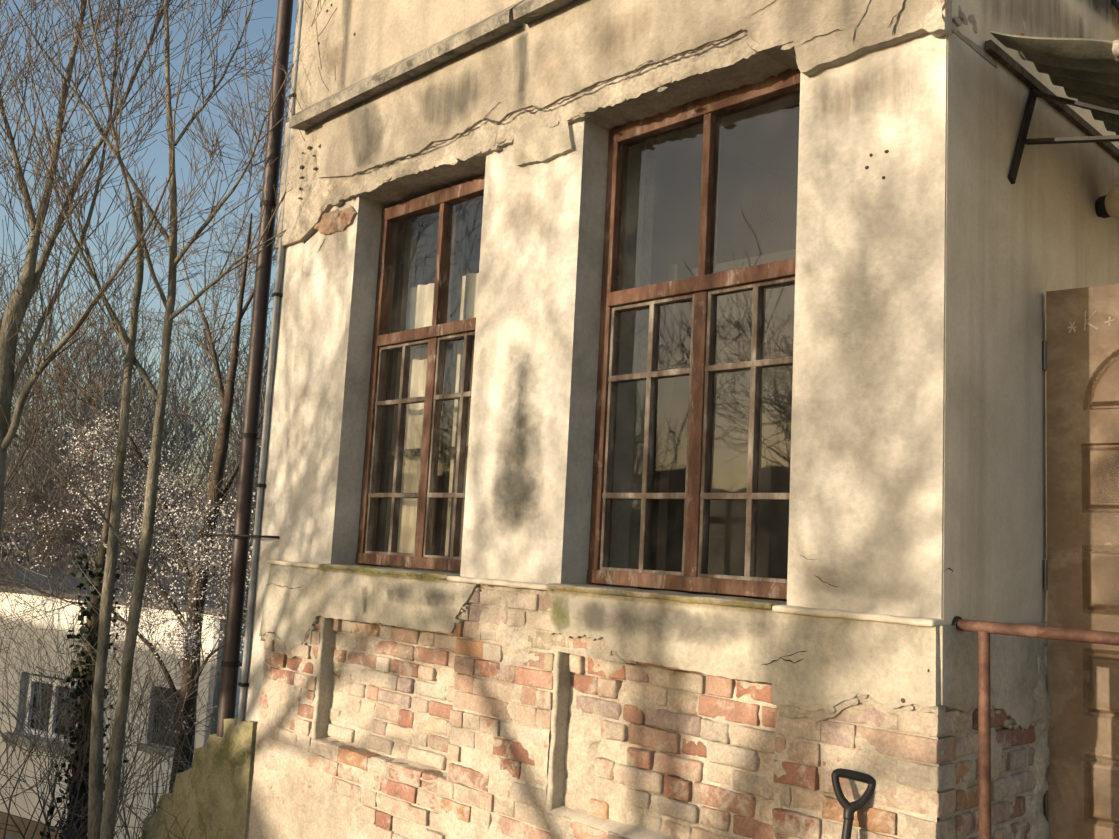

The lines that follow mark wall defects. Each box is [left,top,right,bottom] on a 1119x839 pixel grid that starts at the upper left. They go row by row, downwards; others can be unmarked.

flaking render [298,32,796,235]
crack [354,0,776,174]
crack [802,0,906,44]
damp [504,376,528,516]
flaking render [259,617,320,719]
flaking render [453,585,565,730]
flaking render [772,694,957,839]